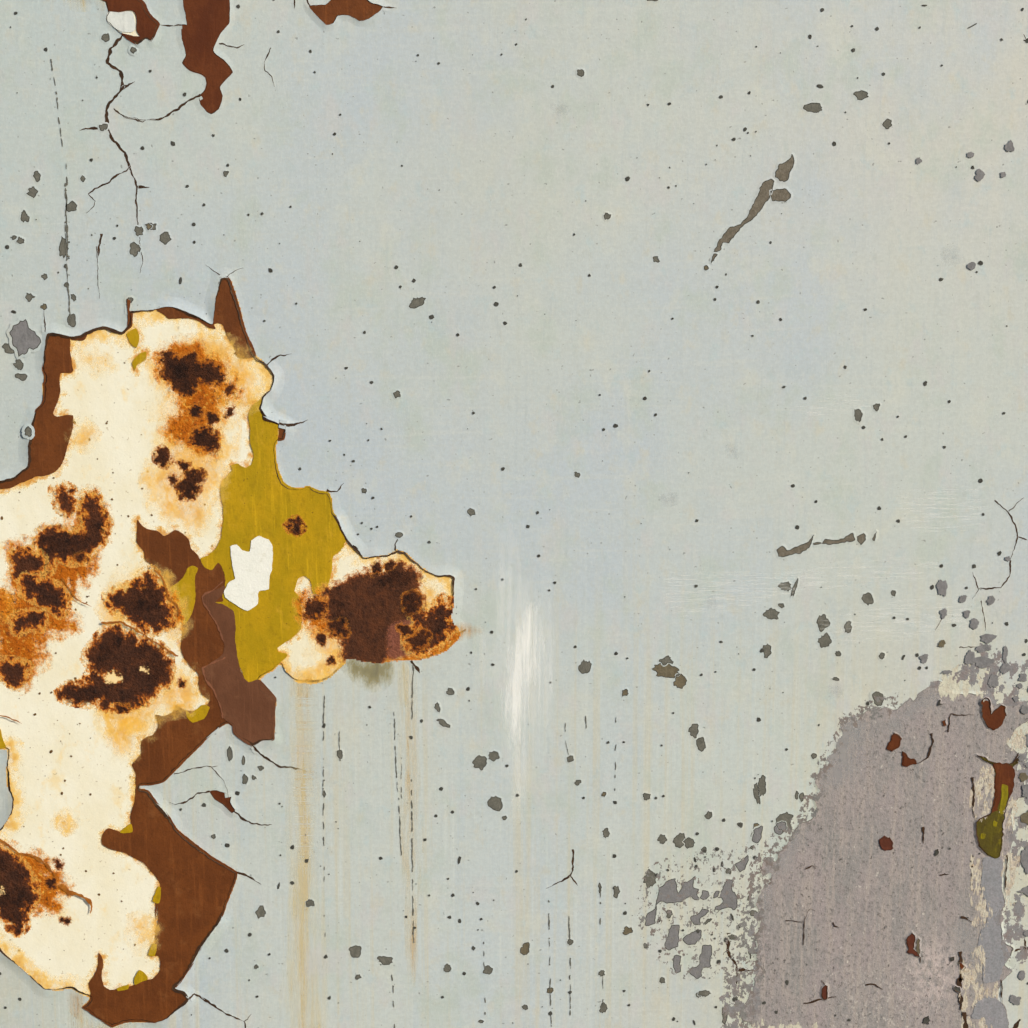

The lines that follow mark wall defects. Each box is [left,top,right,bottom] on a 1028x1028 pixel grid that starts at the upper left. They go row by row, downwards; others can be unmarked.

peeling [292,0,397,31]
peeling [74,0,245,122]
crack [79,32,155,316]
spalling [769,152,797,204]
spalling [812,529,879,547]
peeling [761,575,800,622]
peeling [859,590,876,608]
peeling [936,580,948,619]
crack [959,496,1028,650]
peeling [0,267,469,1028]
crack [174,764,231,798]
peeling [620,595,1028,1028]